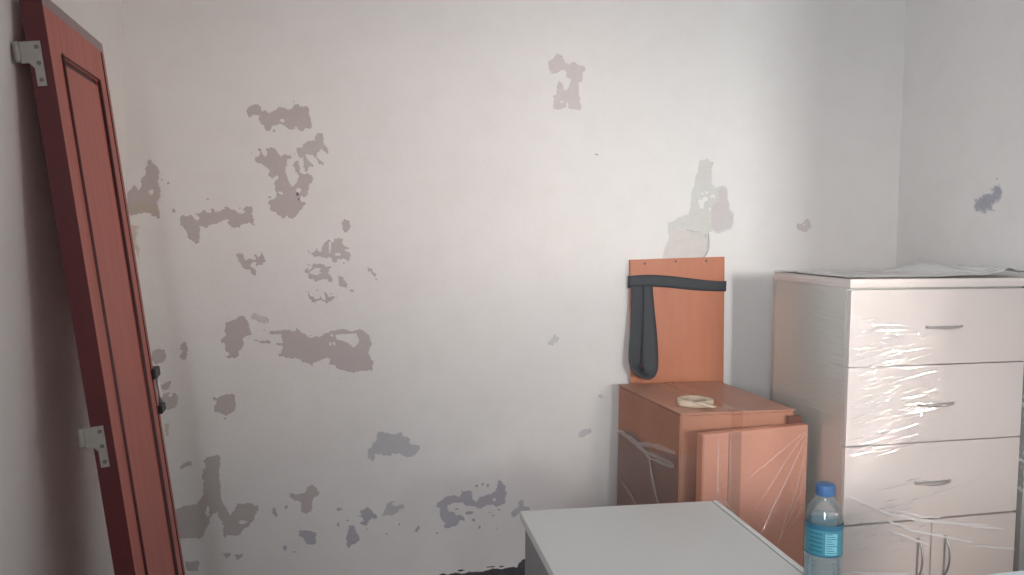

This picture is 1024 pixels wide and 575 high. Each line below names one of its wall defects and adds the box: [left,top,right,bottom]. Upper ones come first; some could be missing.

peeling [548,53,586,110]
peeling [127,159,255,261]
peeling [246,100,330,219]
peeling [668,158,735,237]
peeling [304,219,354,303]
peeling [221,312,374,373]
peeling [213,393,238,419]
peeling [367,431,421,461]
peeling [175,454,320,539]
peeling [436,479,530,534]